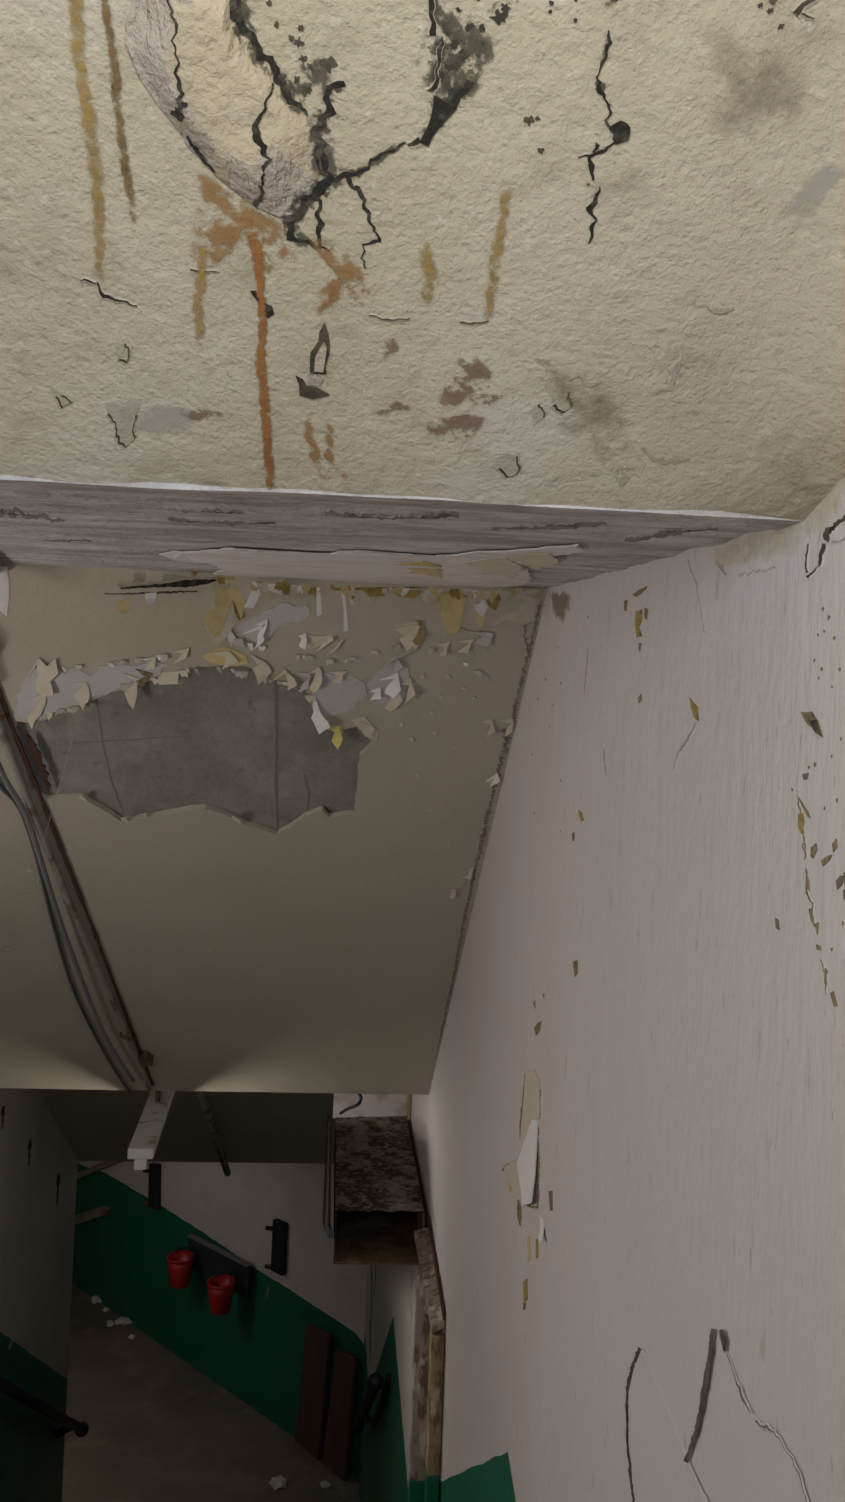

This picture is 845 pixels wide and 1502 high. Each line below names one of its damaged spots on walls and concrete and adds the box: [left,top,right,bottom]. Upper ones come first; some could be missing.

rust [69,0,105,272]
rust [101,0,136,221]
crack [166,0,216,173]
crack [229,0,482,269]
water stain [437,0,518,95]
crack [578,30,615,244]
rust [193,176,288,487]
spalling [296,323,330,399]
crack [324,508,845,633]
spalling [13,544,583,860]
peeling [791,711,845,1006]
peeling [502,1070,553,1310]